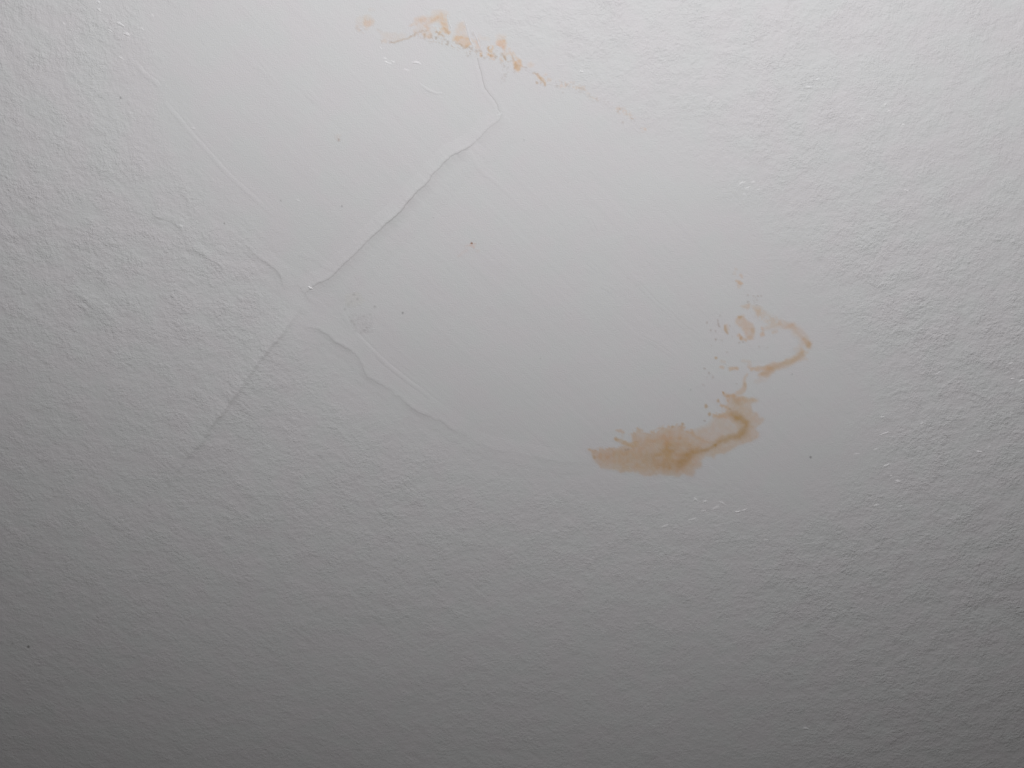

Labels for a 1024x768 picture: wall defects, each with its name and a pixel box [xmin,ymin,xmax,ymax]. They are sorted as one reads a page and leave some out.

damp [355,7,651,133]
damp [586,267,814,479]